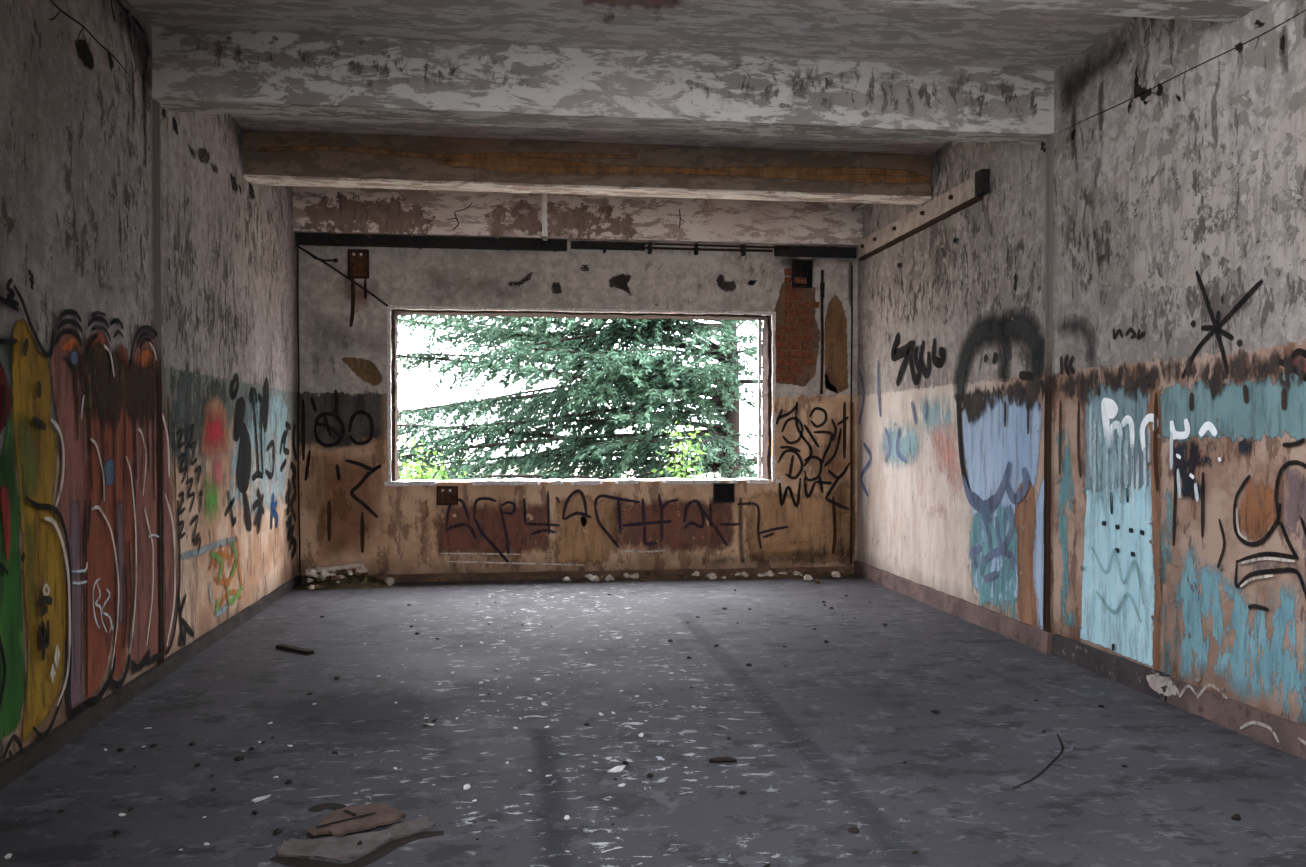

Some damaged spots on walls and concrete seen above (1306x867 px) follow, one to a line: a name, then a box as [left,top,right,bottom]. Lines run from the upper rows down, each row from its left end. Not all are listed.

damp [125,17,150,165]
peeling [329,49,469,86]
peeling [735,63,1037,117]
damp [1063,45,1122,153]
peeling [300,192,436,238]
peeling [485,200,639,241]
flaking render [772,268,848,396]